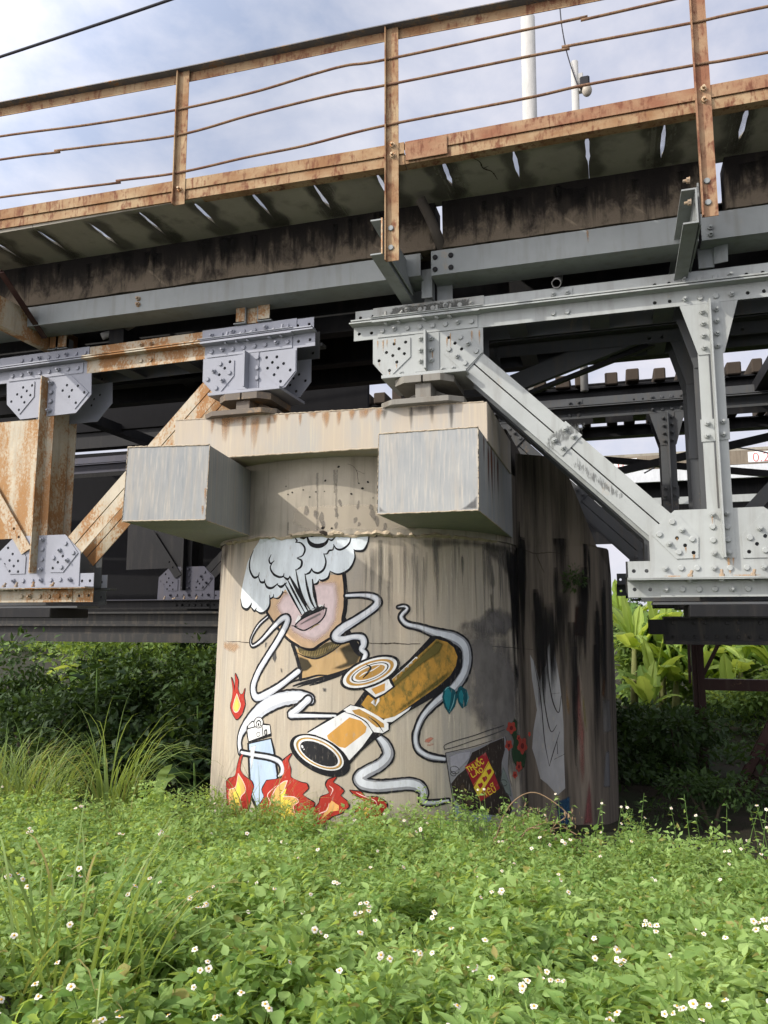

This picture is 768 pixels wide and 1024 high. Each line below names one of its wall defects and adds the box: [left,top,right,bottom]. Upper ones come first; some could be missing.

water stain [380,526,607,771]